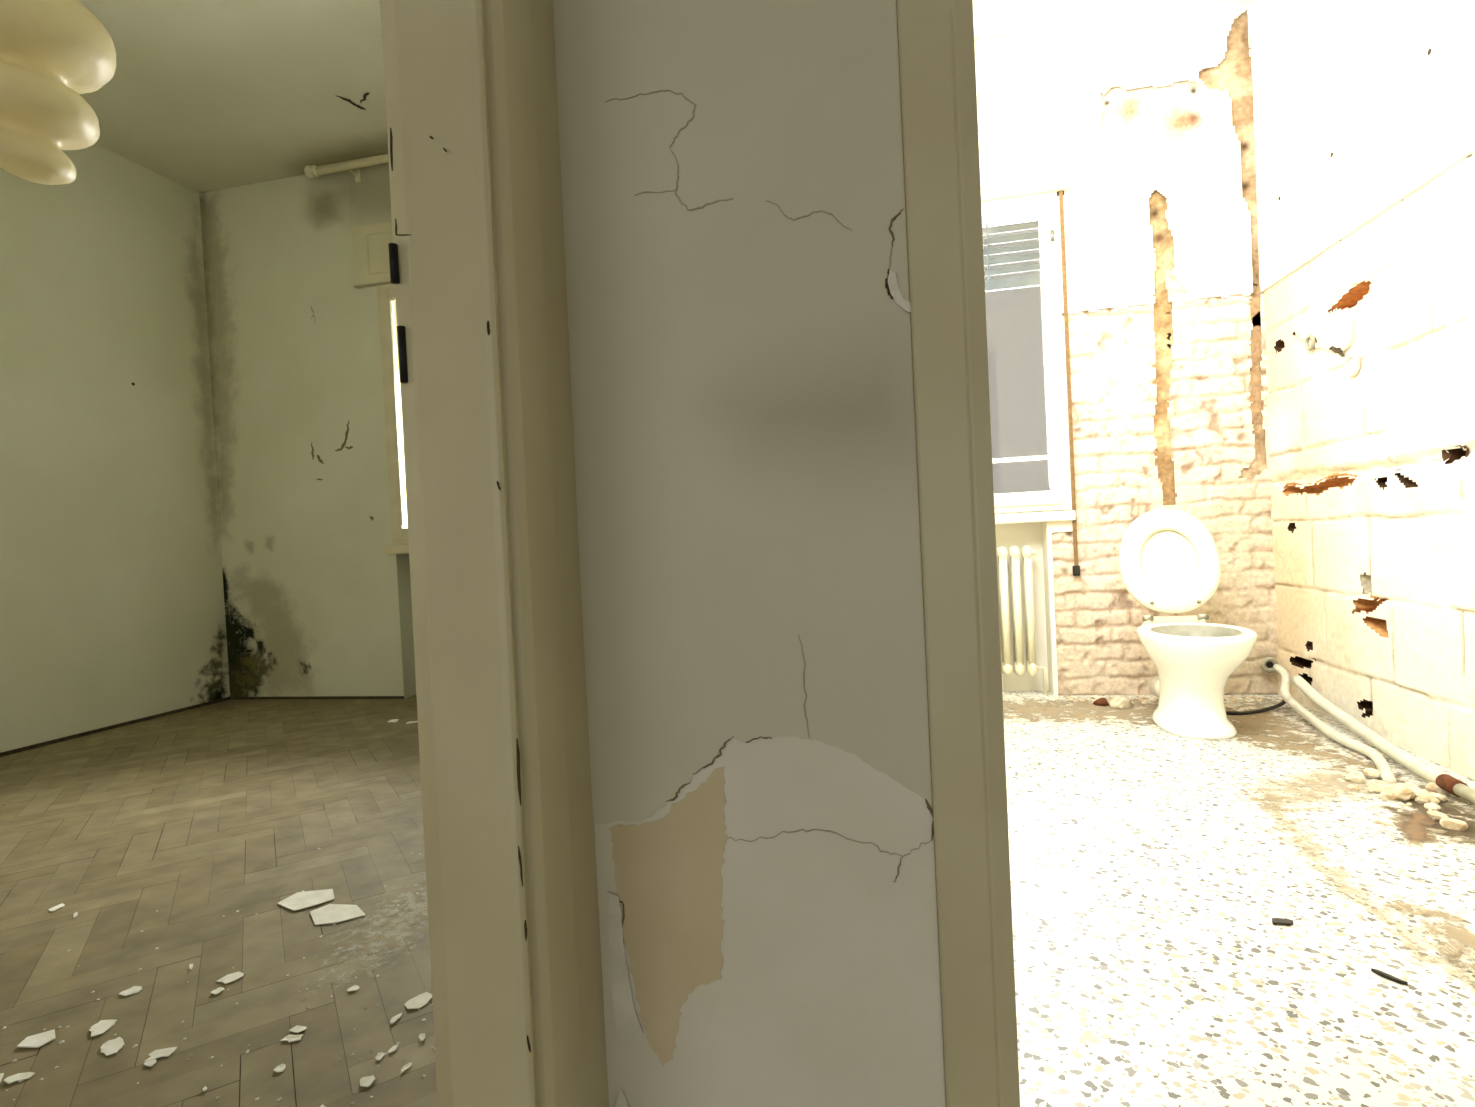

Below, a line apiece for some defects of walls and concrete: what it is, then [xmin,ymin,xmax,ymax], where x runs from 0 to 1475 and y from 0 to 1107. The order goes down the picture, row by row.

crack [605,89,734,211]
spalling [1100,80,1204,158]
crack [769,201,852,231]
crack [888,209,903,269]
flaking render [1052,152,1475,781]
water stain [198,568,276,703]
peeling [594,736,946,1107]